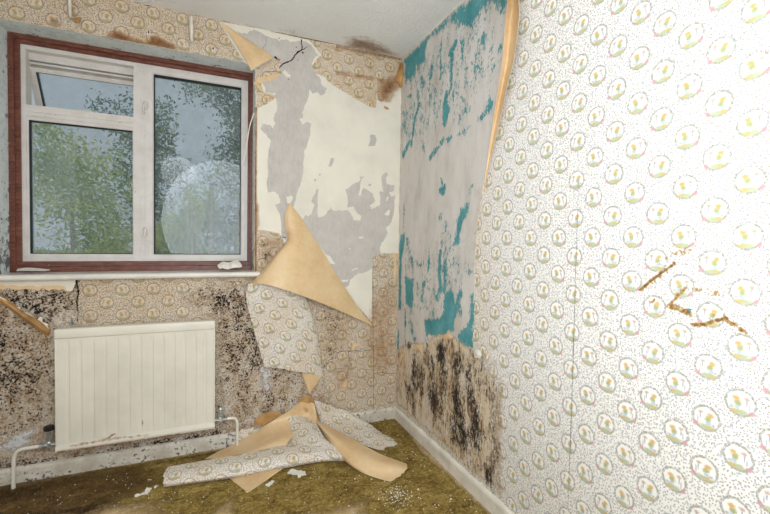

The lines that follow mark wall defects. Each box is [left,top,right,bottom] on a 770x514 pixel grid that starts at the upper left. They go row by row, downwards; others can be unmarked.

leakage [109,31,175,49]
crack [263,31,392,80]
leakage [353,40,401,60]
leakage [381,77,398,99]
leakage [255,107,286,271]
peeling [220,0,520,349]
peeling [0,280,76,292]
crack [71,280,79,321]
leakage [0,278,347,469]
leakage [396,334,520,493]